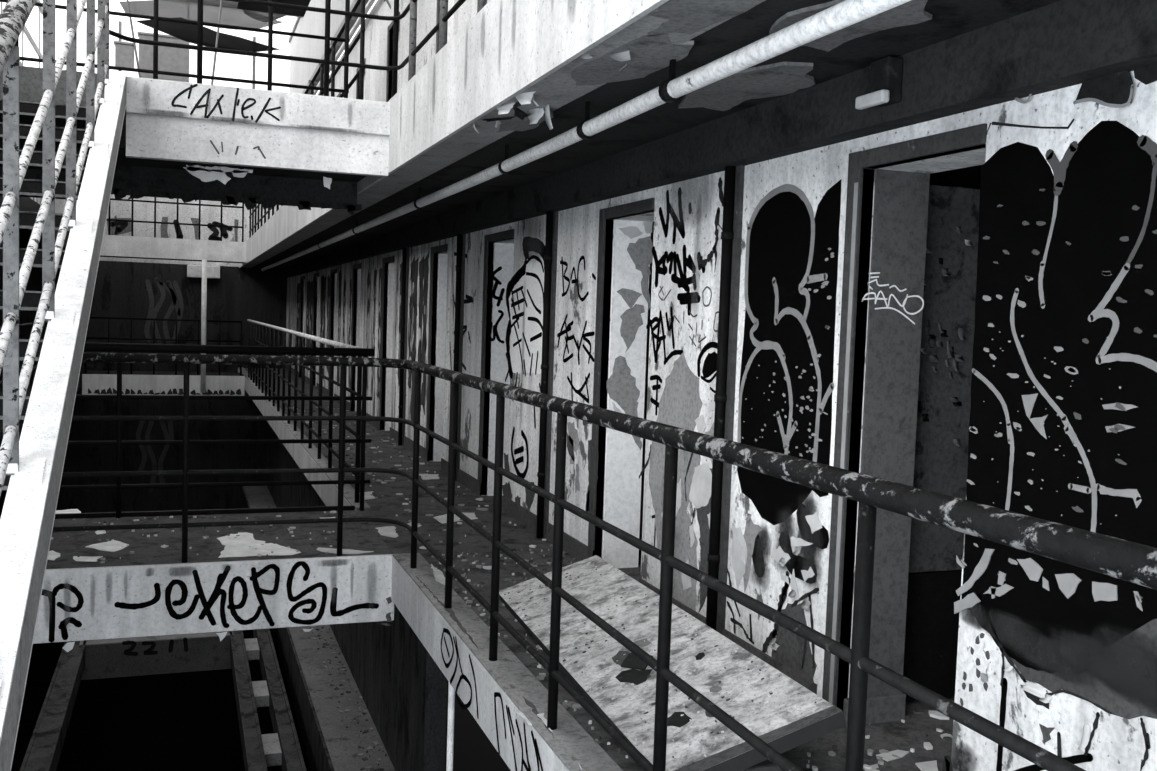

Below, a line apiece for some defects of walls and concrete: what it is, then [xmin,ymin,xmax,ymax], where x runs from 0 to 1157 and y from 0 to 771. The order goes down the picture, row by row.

peeling [1073,63,1157,108]
peeling [953,426,978,459]
peeling [994,346,1078,456]
peeling [1101,386,1137,433]
peeling [731,513,763,593]
peeling [769,512,822,683]
peeling [954,543,1118,614]
peeling [1133,591,1143,611]